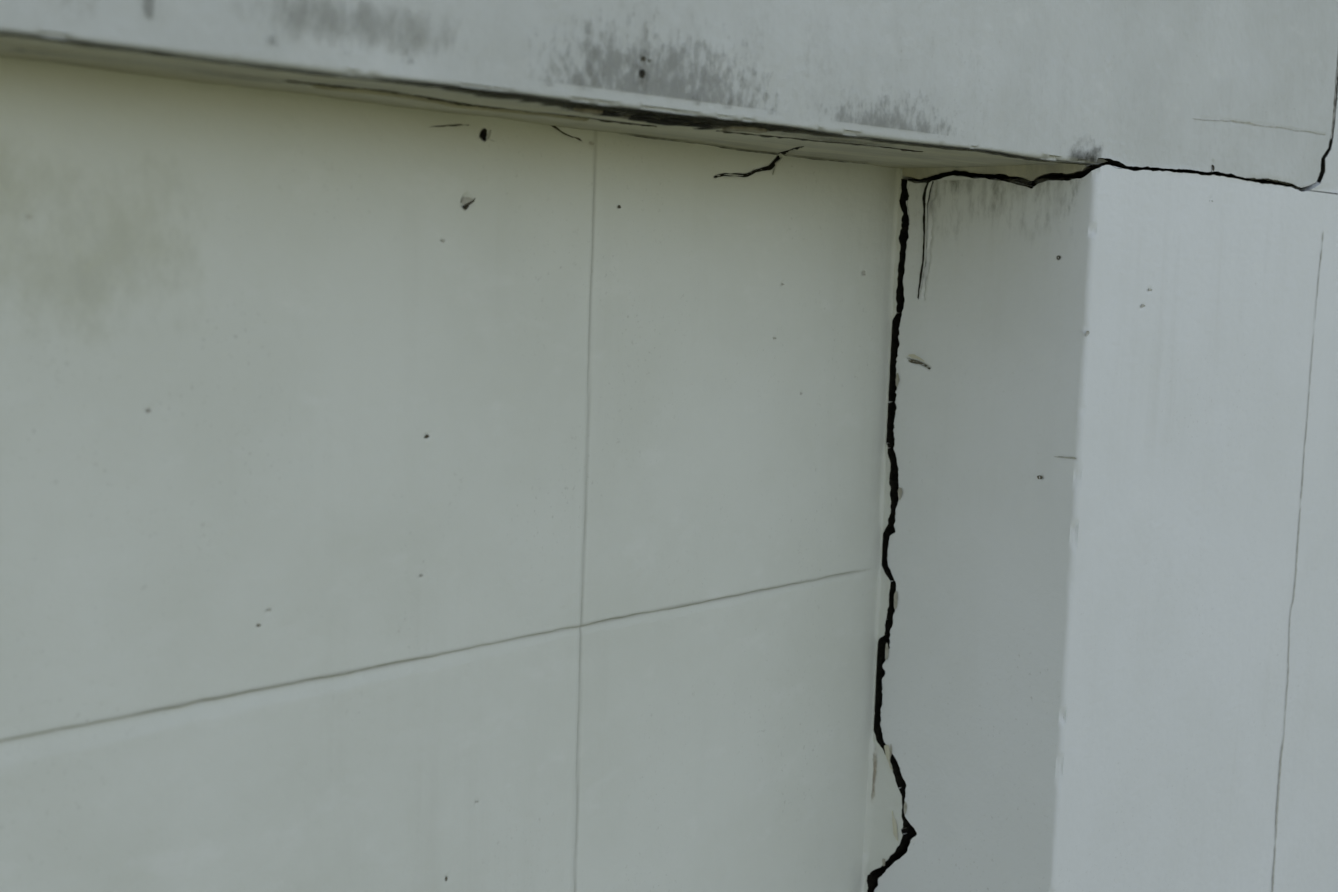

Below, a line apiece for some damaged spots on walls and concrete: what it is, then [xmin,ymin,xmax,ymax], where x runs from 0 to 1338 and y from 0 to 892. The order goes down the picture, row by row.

crack [622,55,1338,892]